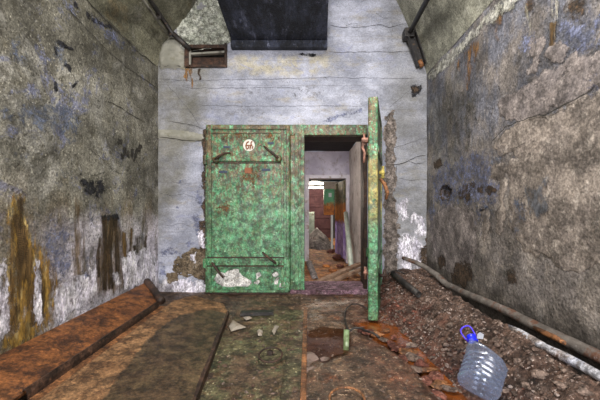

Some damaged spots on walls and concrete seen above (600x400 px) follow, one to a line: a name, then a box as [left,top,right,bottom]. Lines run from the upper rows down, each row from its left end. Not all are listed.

corrosion [1,194,58,354]
spalling [159,165,206,289]
spalling [383,110,401,275]
efflorescence [396,198,427,270]
flaking render [427,14,600,276]
crack [489,84,597,148]